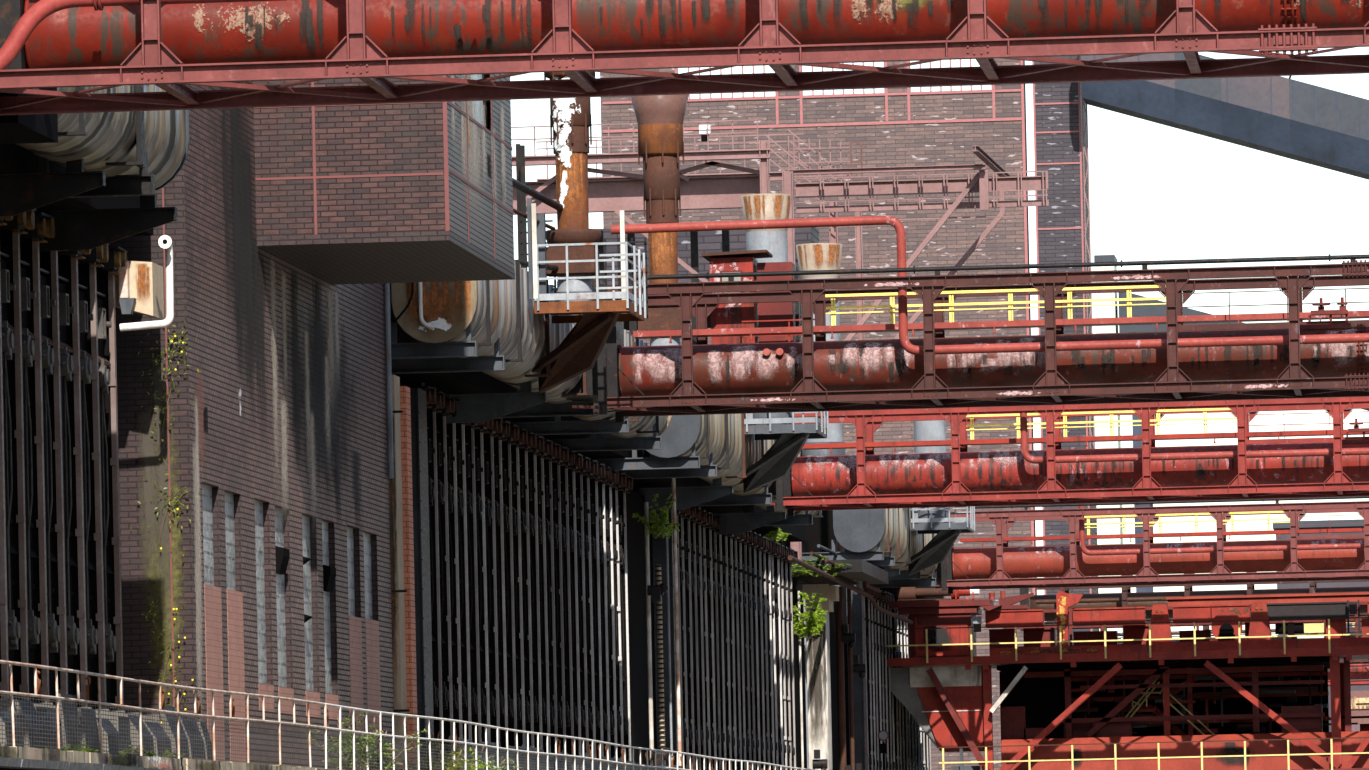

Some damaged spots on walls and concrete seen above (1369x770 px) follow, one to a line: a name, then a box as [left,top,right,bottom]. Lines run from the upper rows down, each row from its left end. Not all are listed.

peeling [192,2,291,42]
peeling [851,0,928,24]
peeling [552,98,581,208]
rust [743,195,790,217]
rust [648,223,674,271]
rust [798,244,840,265]
leakage [222,108,361,514]
peeling [633,348,682,380]
peeling [708,346,803,380]
peeling [828,342,914,370]
peeling [947,338,1045,370]